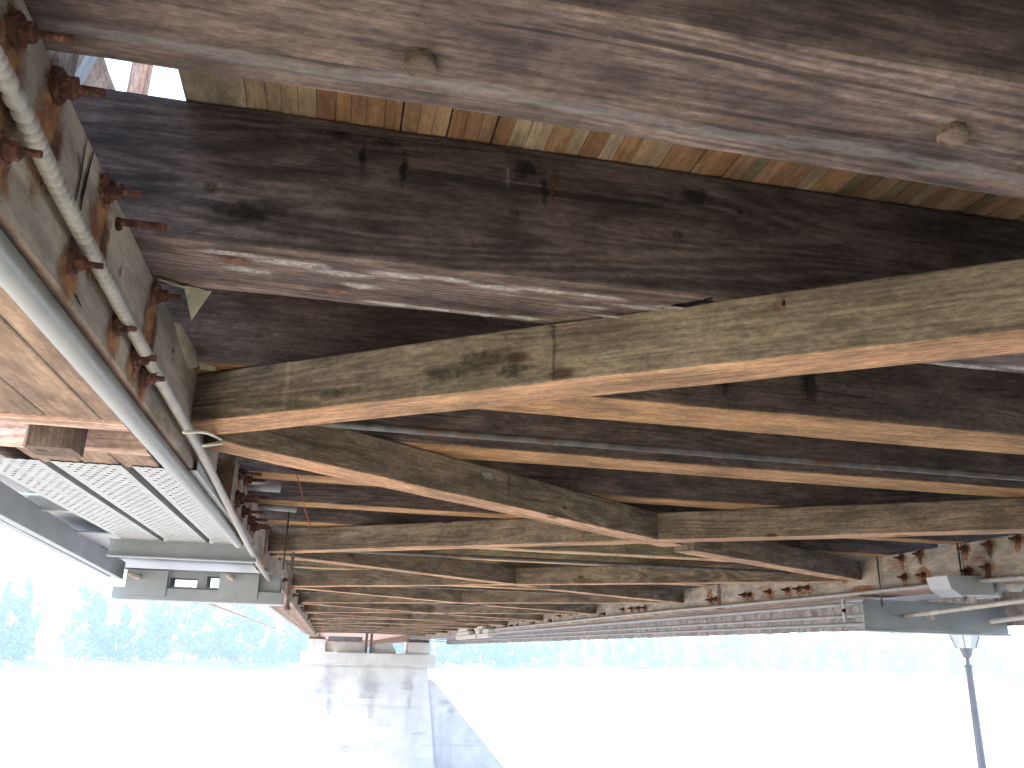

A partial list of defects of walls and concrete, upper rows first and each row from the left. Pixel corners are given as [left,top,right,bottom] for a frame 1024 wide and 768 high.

corrosion [0,1,26,87]
corrosion [0,91,17,138]
corrosion [34,57,64,162]
corrosion [26,157,46,197]
corrosion [91,172,112,260]
corrosion [58,237,94,301]
corrosion [106,312,147,403]
corrosion [144,282,158,352]
crack [548,324,556,376]
corrosion [898,549,931,586]